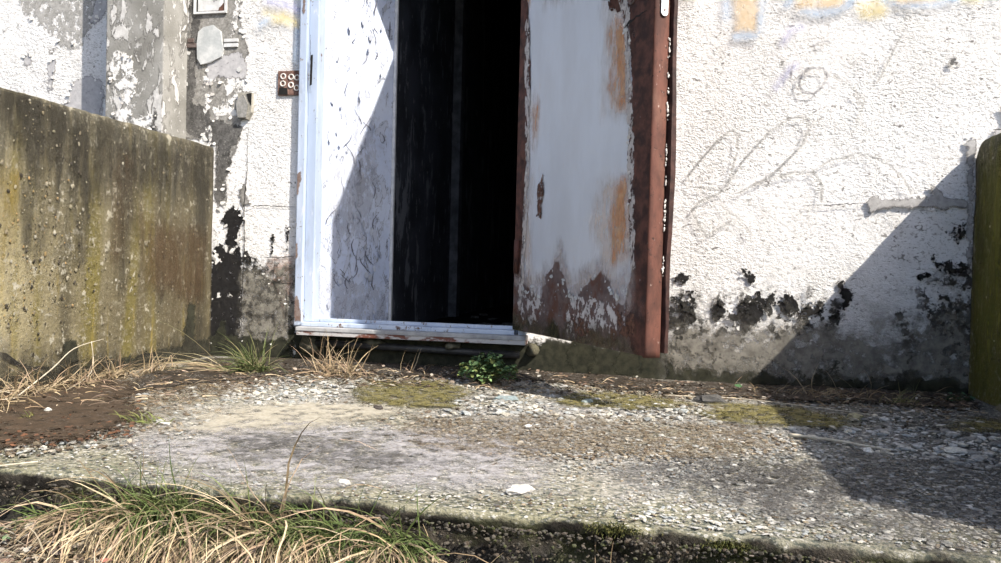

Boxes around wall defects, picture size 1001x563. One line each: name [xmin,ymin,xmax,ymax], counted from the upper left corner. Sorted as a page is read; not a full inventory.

peeling [18,0,107,92]
peeling [58,51,156,130]
leakage [6,0,243,238]
corrosion [609,25,630,107]
spalling [186,0,301,345]
corrosion [612,179,627,262]
leakage [0,257,973,396]